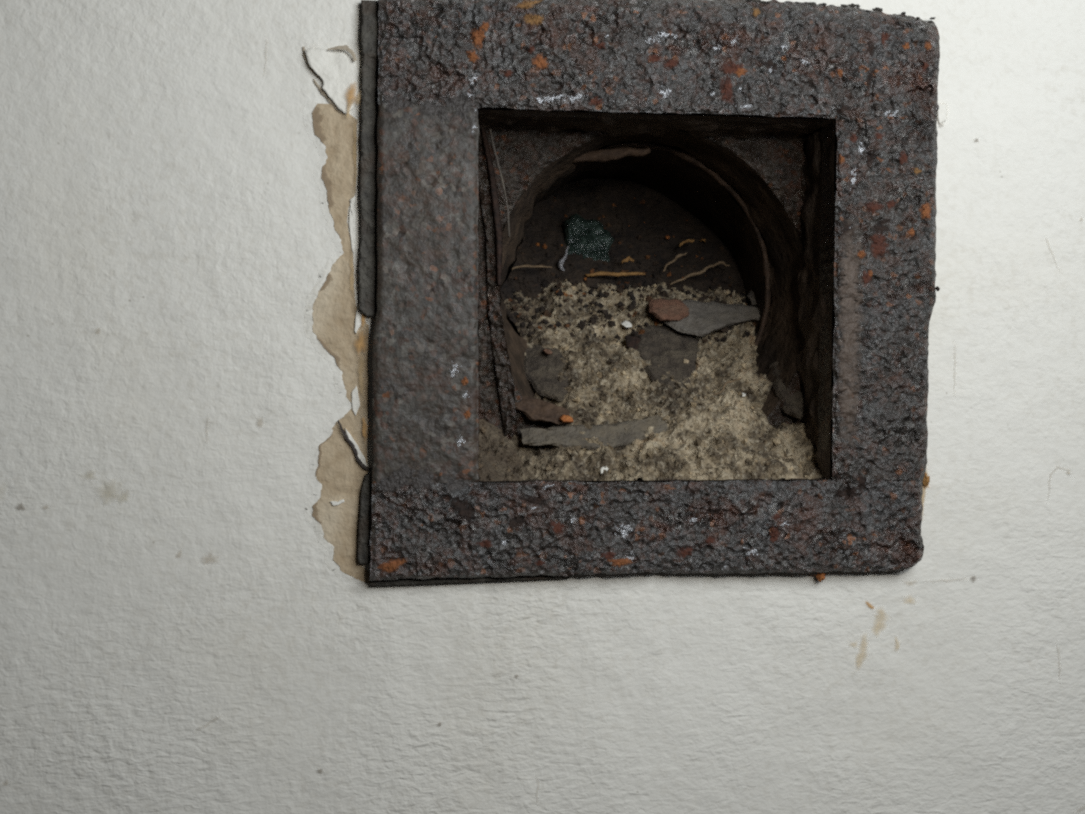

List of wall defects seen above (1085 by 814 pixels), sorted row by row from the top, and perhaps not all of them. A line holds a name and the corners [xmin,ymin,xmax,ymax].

peeling [303,48,370,590]